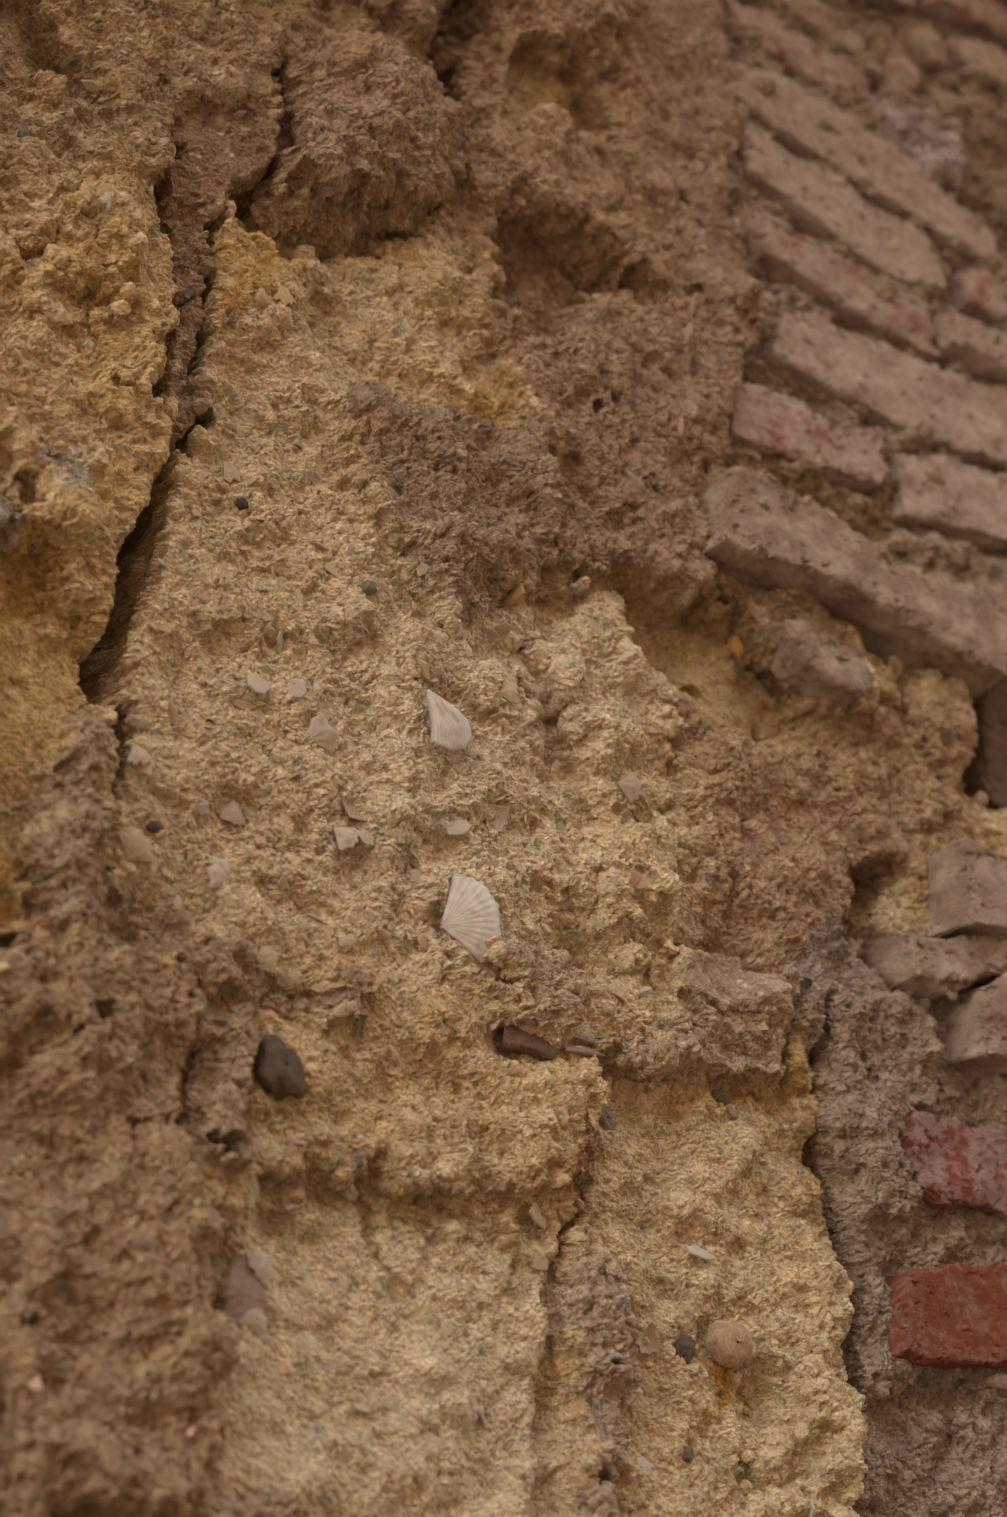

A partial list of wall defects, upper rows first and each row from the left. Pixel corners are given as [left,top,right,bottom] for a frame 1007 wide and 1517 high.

crack [76,53,319,871]
crack [777,974,871,1407]
crack [852,1475,868,1517]